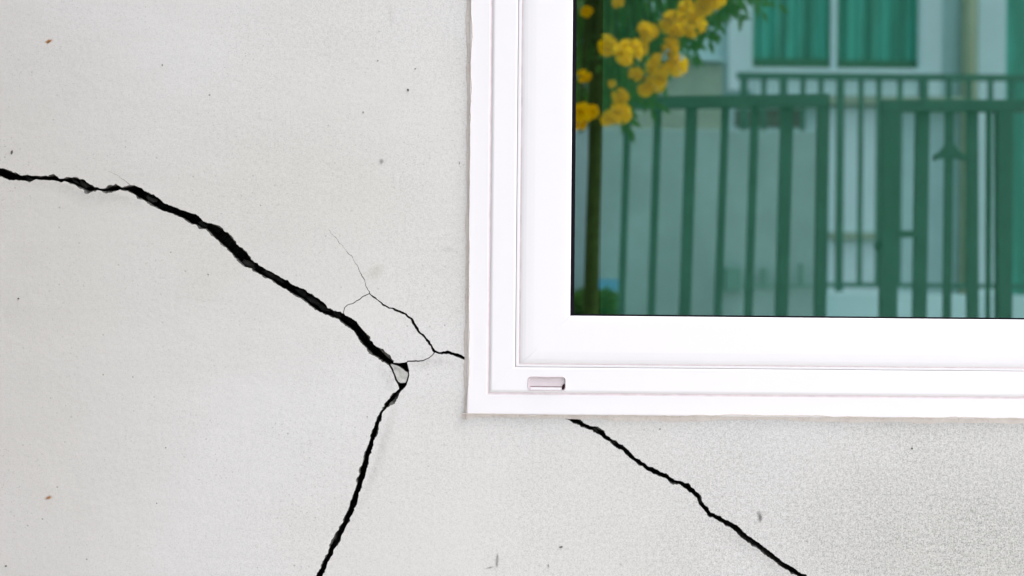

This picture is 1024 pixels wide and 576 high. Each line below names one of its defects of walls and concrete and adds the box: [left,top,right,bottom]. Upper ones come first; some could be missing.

crack [0,168,465,576]
crack [567,419,807,576]